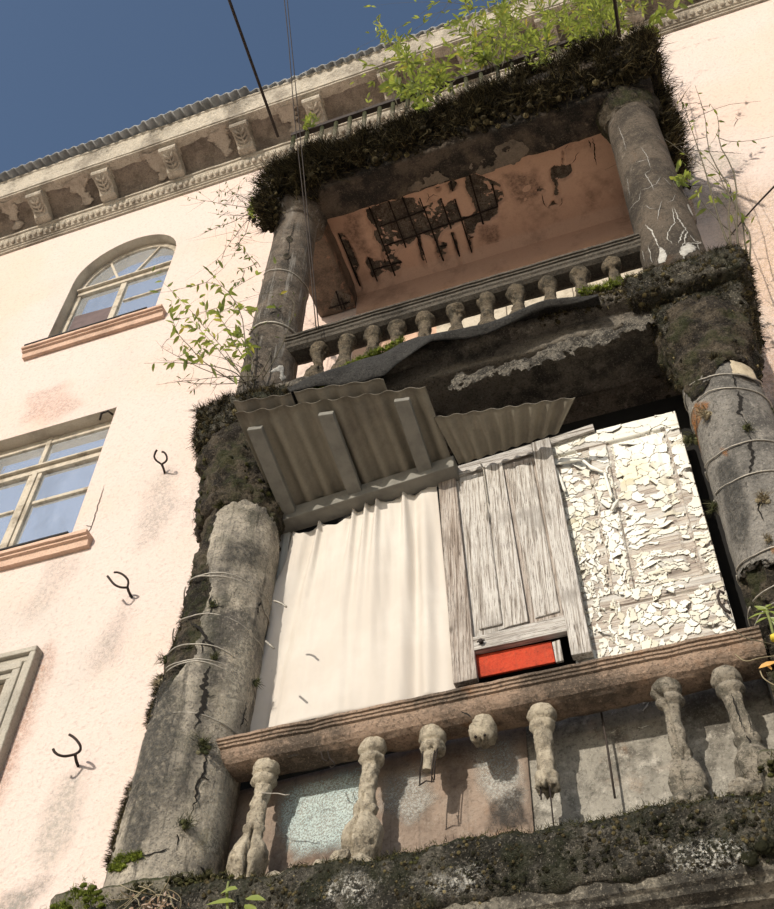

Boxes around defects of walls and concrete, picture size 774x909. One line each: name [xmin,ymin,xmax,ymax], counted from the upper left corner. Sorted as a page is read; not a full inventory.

flaking render [0,196,24,230]
flaking render [205,121,234,157]
flaking render [338,139,529,286]
flaking render [549,158,572,206]
crack [609,121,702,263]
spalling [448,313,657,391]
flaking render [681,348,757,401]
crack [732,373,765,521]
peeling [552,411,736,664]
crack [190,594,223,729]
spalling [739,558,774,697]
crack [192,755,209,812]